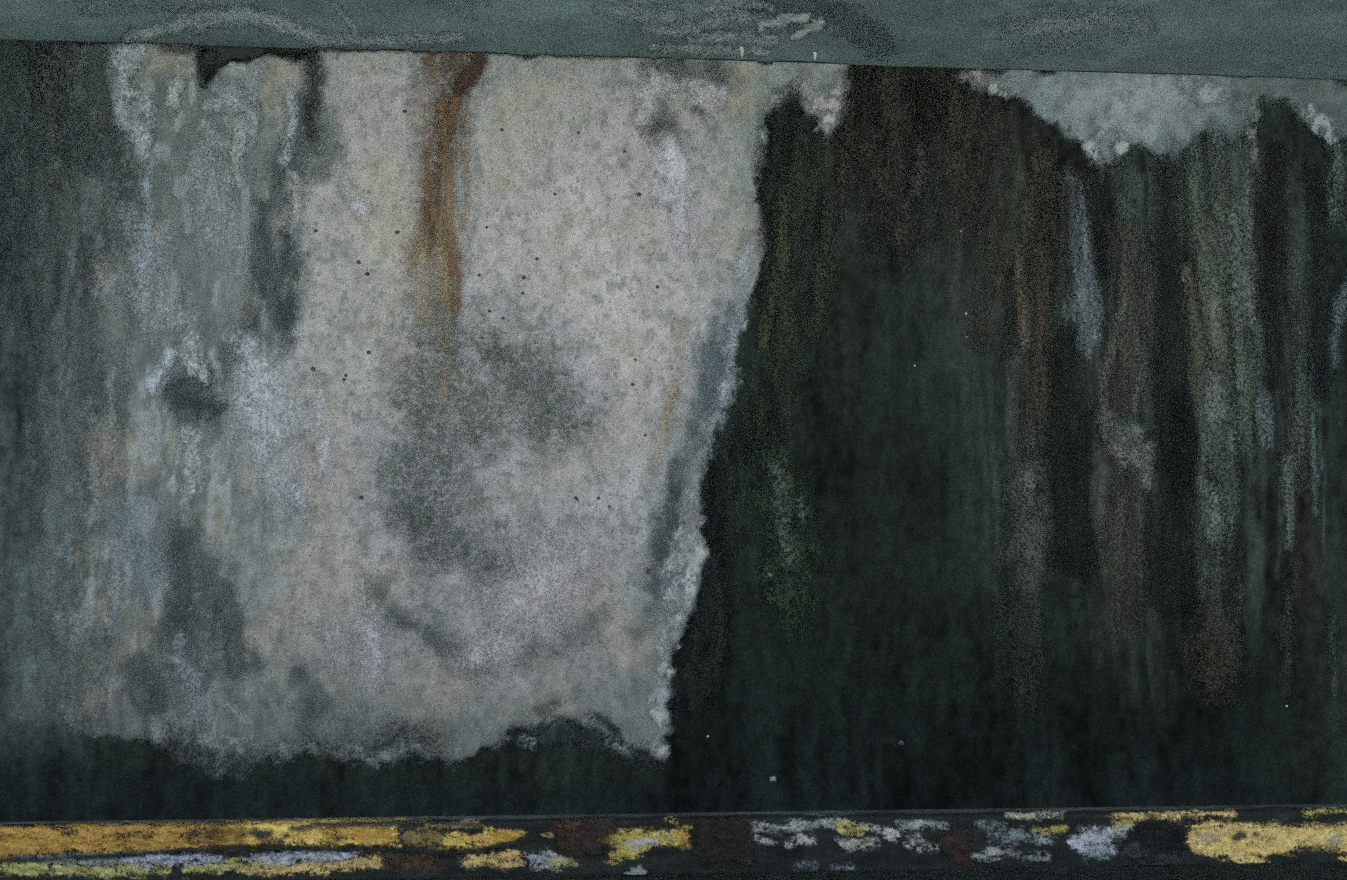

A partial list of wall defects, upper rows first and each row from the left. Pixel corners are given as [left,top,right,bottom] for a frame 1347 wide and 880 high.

water stain [0,42,369,517]
rust [403,52,475,398]
water stain [598,0,888,258]
water stain [115,499,266,738]
peeling [0,817,579,880]
water stain [322,293,612,694]
water stain [506,699,655,765]
peeling [598,816,692,865]
water stain [633,301,754,717]
peeling [752,815,948,871]
peeling [971,807,1347,864]
water stain [998,133,1347,712]